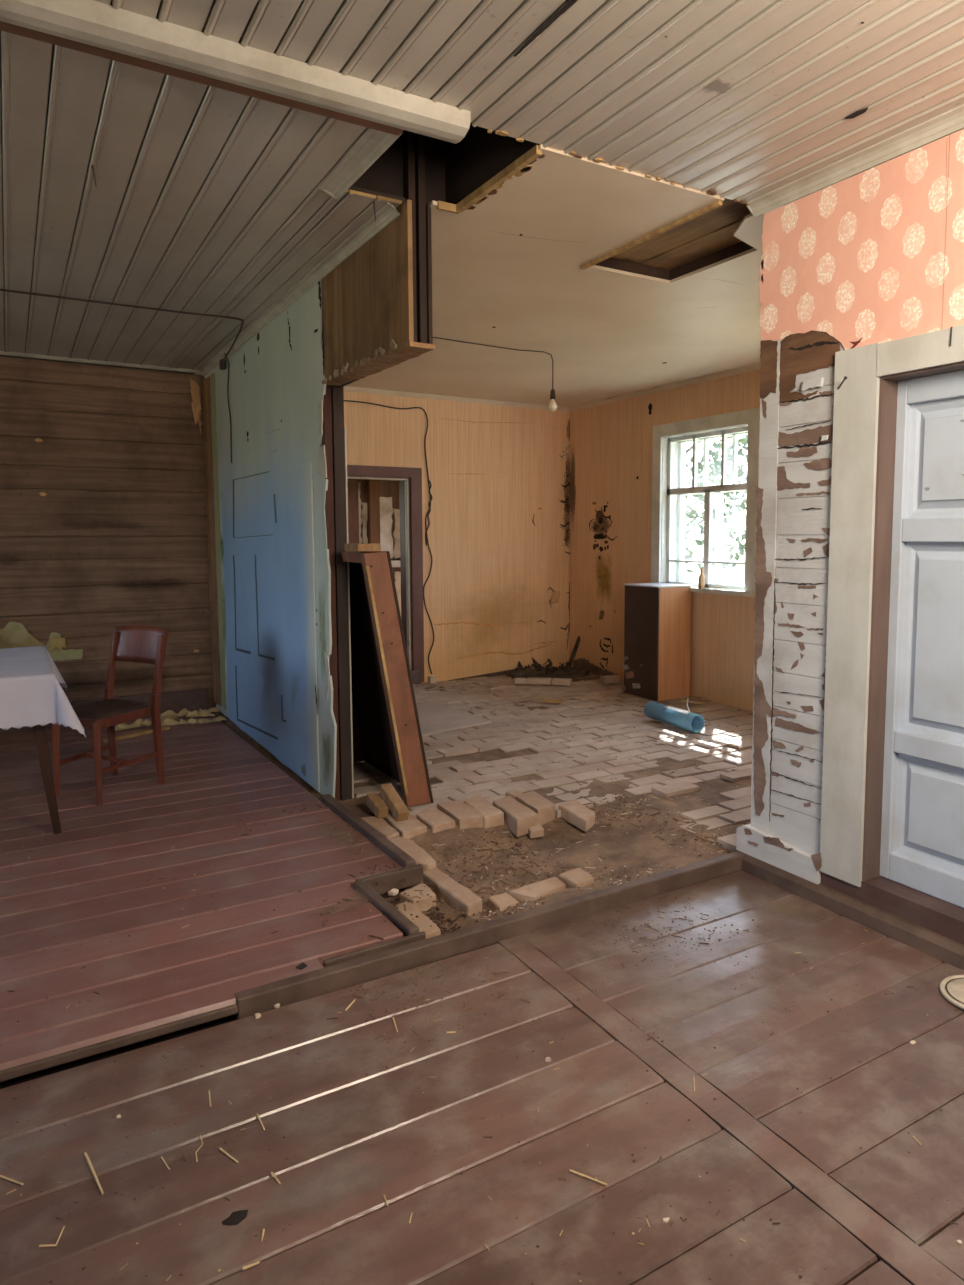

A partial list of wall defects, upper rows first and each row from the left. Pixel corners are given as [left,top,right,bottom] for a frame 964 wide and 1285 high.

damp [559,421,576,554]
damp [589,502,617,594]
peeling [753,331,840,817]
damp [590,611,616,669]
peeling [744,828,793,851]
peeling [811,853,822,871]